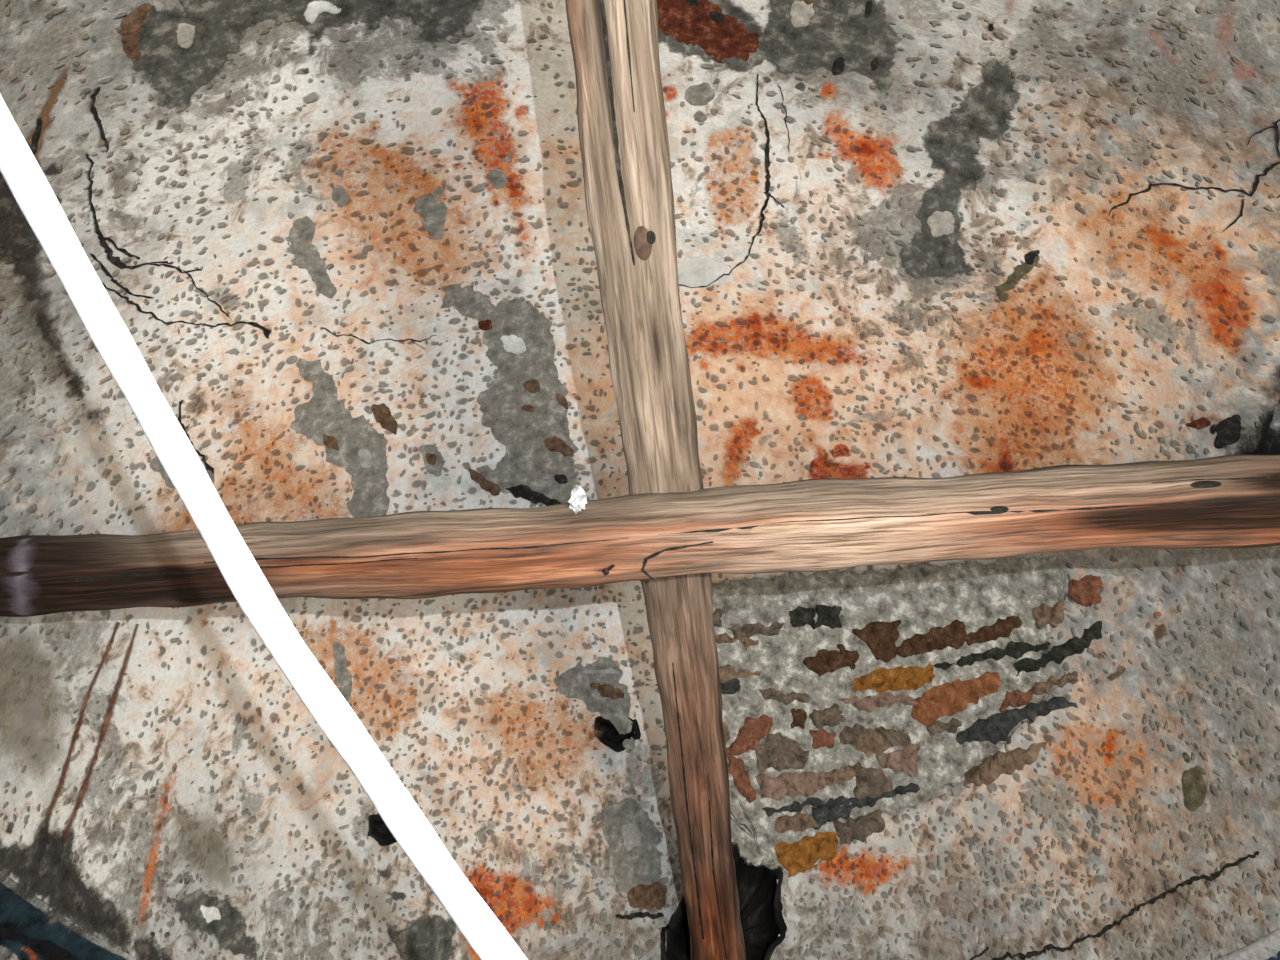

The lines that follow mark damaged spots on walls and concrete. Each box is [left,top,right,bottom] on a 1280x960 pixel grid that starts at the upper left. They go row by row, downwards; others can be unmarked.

crack [86,87,271,338]
corrosion [450,76,531,257]
crack [679,75,790,288]
corrosion [820,115,903,188]
crack [1109,119,1280,232]
corrosion [687,309,873,486]
corrosion [940,275,1114,475]
spalling [1186,366,1280,455]
spalling [712,556,1103,960]
corrosion [464,864,564,935]
flaking render [591,797,691,960]
crack [969,851,1259,960]